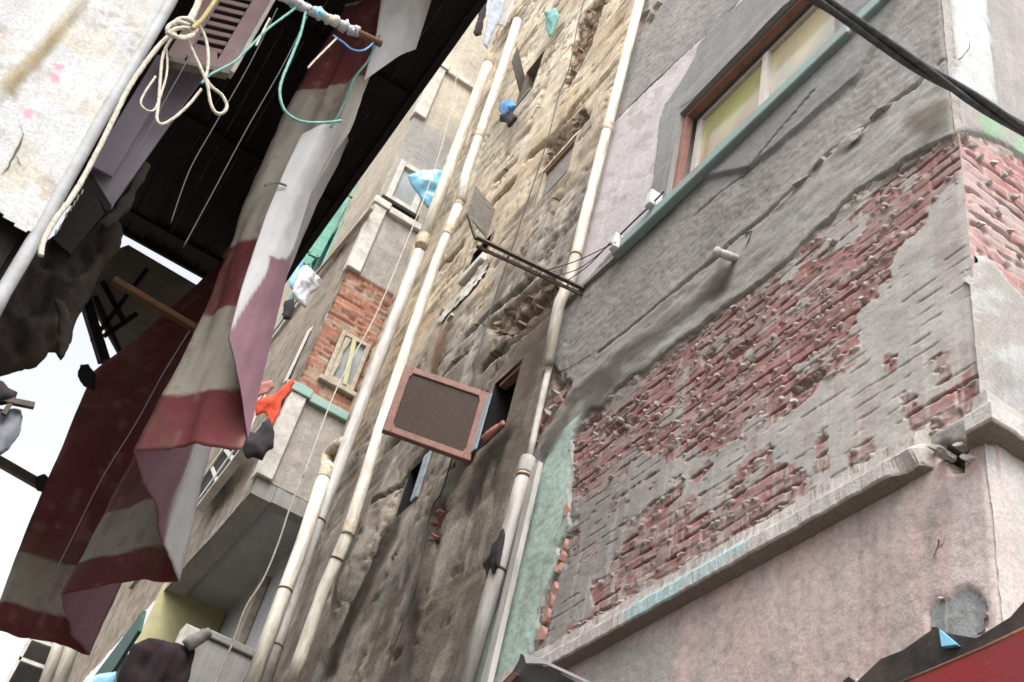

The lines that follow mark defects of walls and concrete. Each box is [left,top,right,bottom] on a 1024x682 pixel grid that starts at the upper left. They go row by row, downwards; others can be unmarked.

flaking render [565,0,606,87]
flaking render [792,102,894,188]
flaking render [493,280,559,337]
flaking render [526,365,572,451]
flaking render [534,132,1024,651]